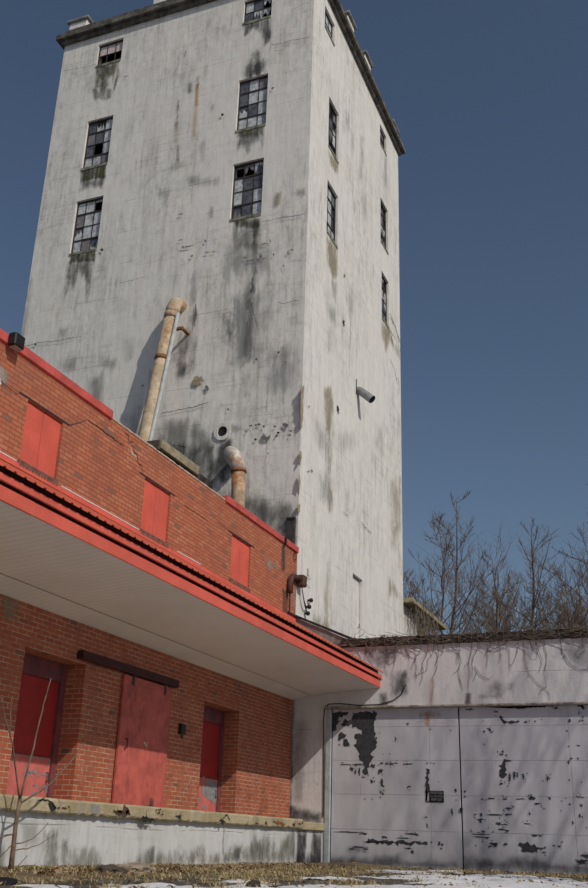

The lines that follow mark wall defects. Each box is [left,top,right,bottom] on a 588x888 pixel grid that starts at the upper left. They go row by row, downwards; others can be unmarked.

water stain [245,19,271,43]
water stain [95,63,117,98]
water stain [234,219,260,252]
water stain [236,286,260,358]
water stain [325,388,333,428]
crack [71,420,143,469]
water stain [175,439,231,482]
peeling [489,705,558,724]
peeling [332,710,413,800]
peeling [24,755,70,812]
peeling [470,748,563,856]
peeling [339,831,443,854]